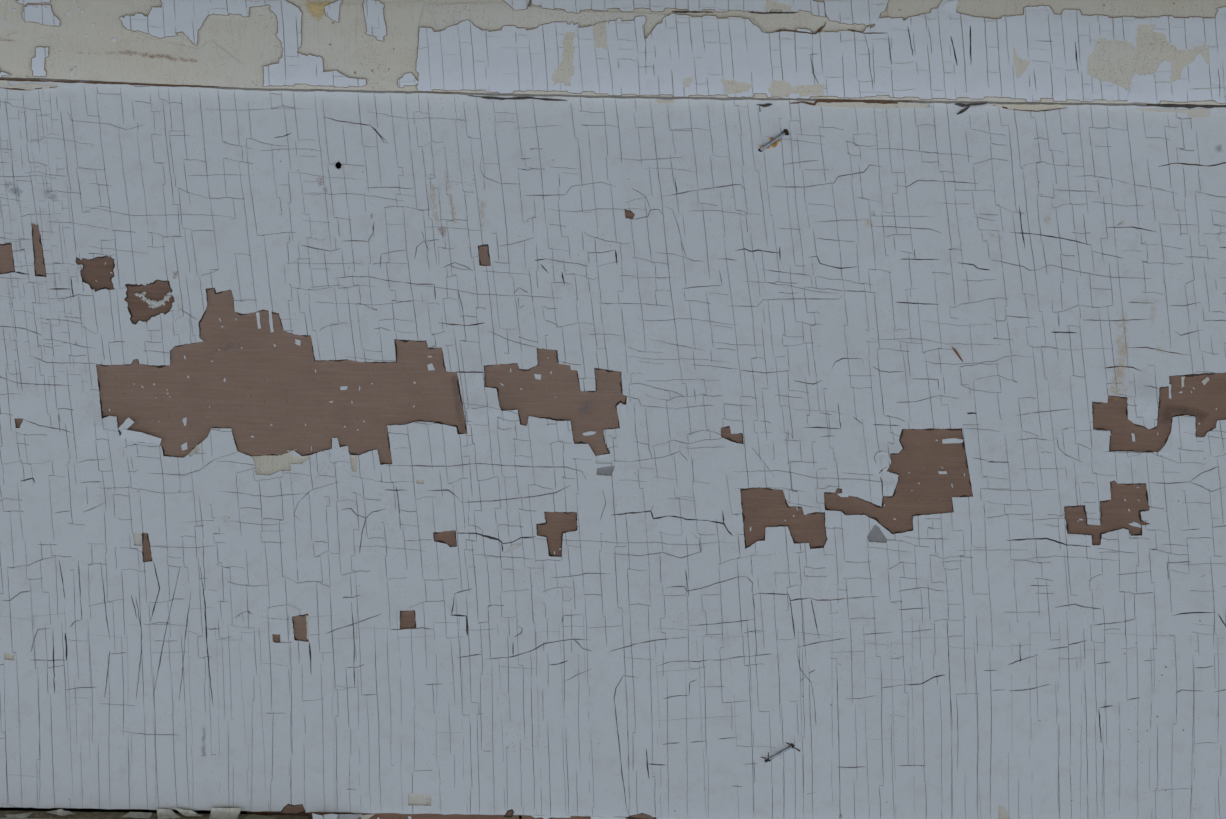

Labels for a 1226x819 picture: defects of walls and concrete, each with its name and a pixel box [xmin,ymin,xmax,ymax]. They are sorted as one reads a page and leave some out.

crack [405,91,567,101]
crack [877,207,1156,271]
peeling [75,256,175,330]
peeling [95,287,467,475]
peeling [483,347,627,476]
crack [1053,293,1226,389]
peeling [1092,372,1226,453]
crack [342,463,586,553]
peeling [739,428,973,549]
peeling [1064,481,1151,545]
crack [31,561,251,702]
crack [309,570,931,808]